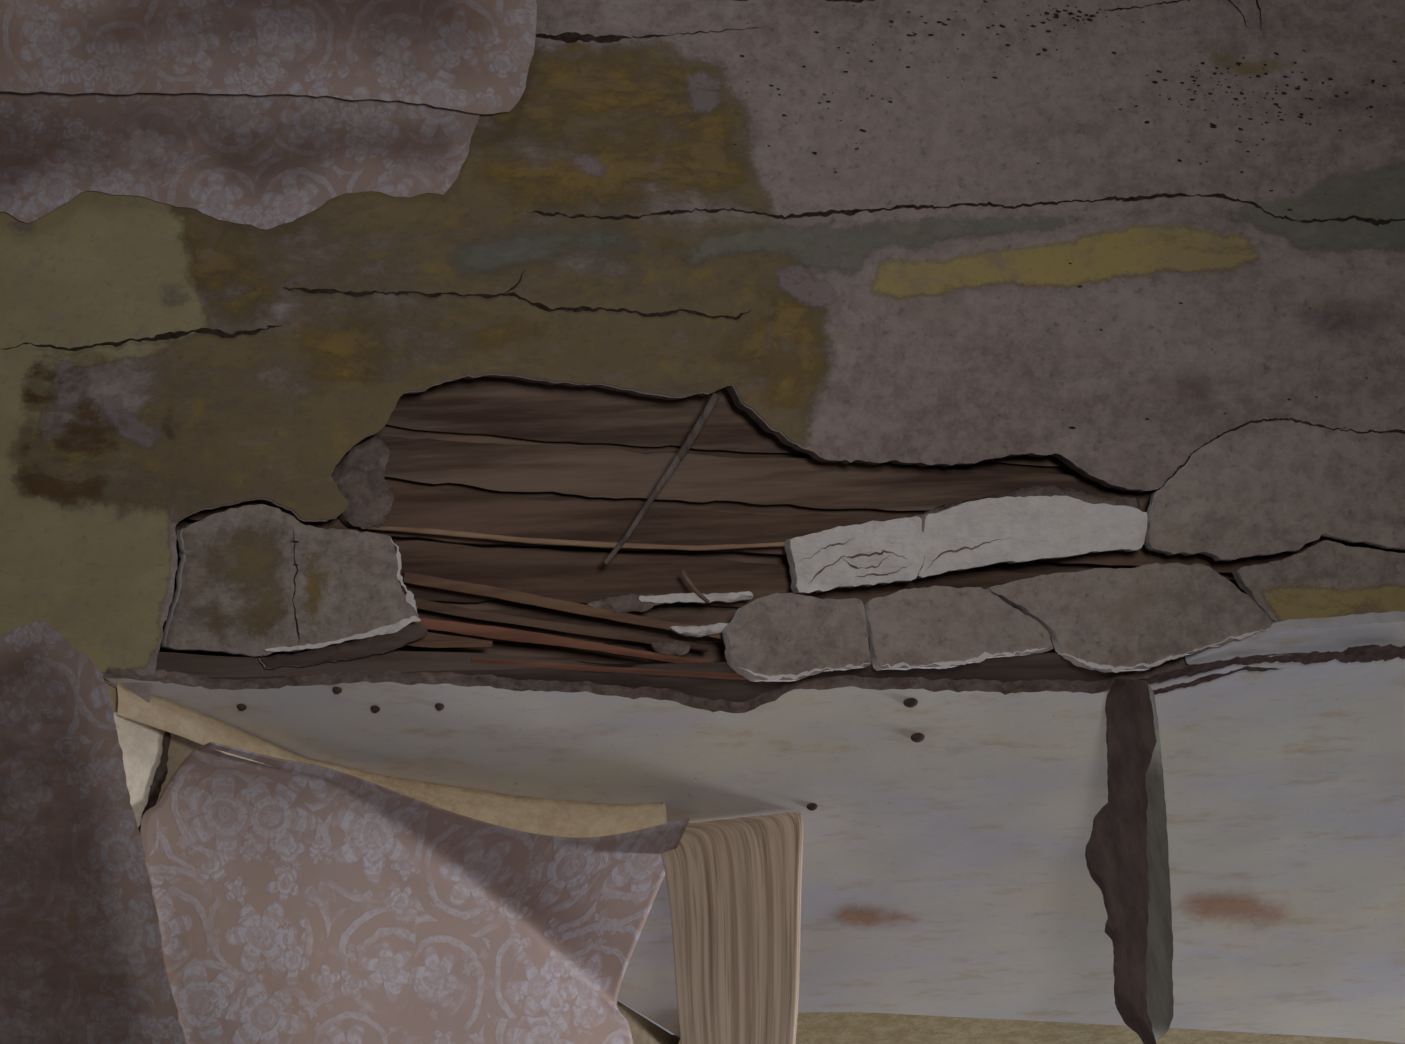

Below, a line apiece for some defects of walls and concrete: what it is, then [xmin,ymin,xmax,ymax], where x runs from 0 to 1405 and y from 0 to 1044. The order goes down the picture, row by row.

crack [536,0,763,43]
leakage [986,5,1123,57]
crack [1105,0,1190,11]
crack [1229,0,1262,25]
leakage [1146,50,1349,173]
crack [528,193,1405,226]
peeling [1240,161,1405,252]
crack [283,269,751,320]
crack [5,325,282,351]
peeling [0,40,1260,673]
crack [1162,418,1405,488]